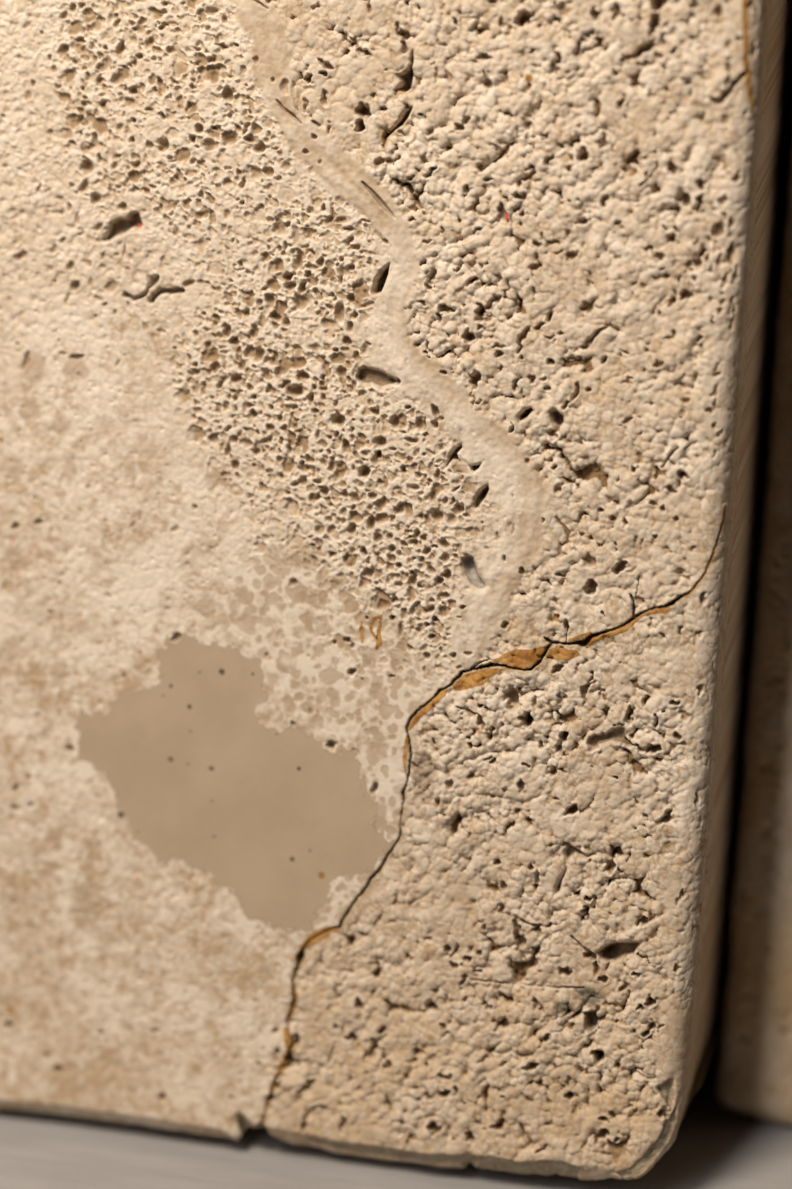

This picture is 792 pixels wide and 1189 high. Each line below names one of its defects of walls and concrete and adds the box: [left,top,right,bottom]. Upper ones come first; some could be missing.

crack [260,505,726,1124]